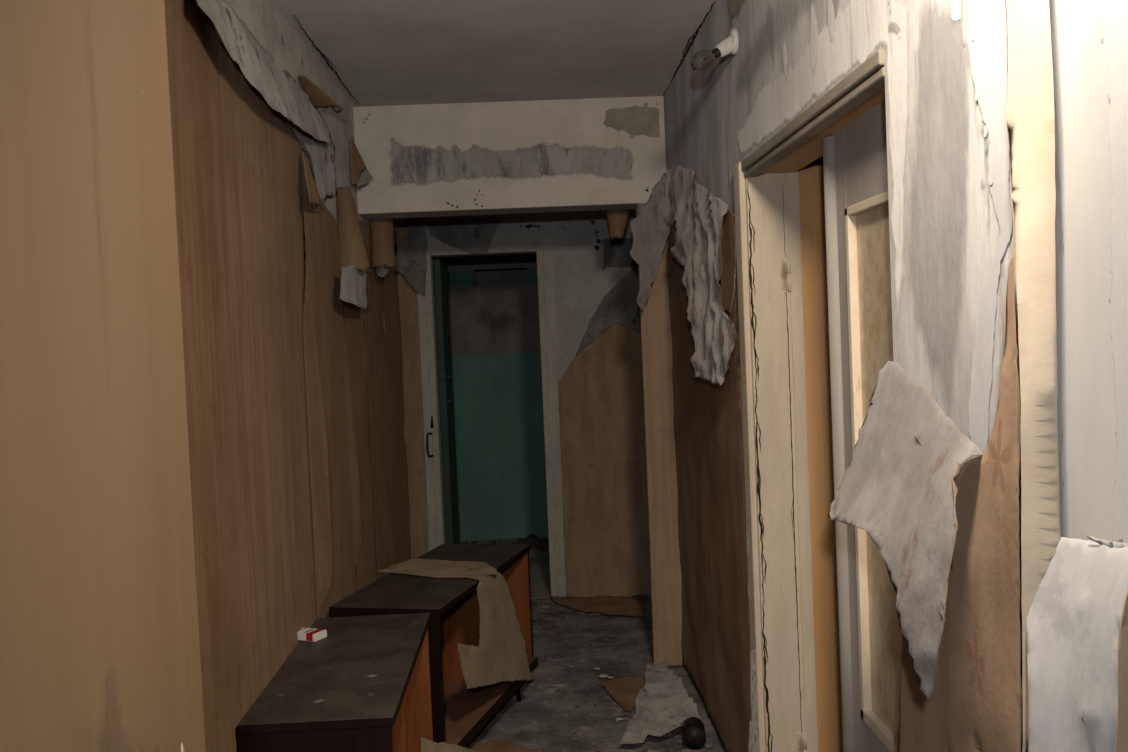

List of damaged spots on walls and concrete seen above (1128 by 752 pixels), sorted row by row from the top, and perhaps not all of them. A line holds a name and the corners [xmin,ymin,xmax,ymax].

peeling [390,102,660,207]
peeling [603,238,638,270]
peeling [910,0,1012,454]
peeling [748,650,759,752]